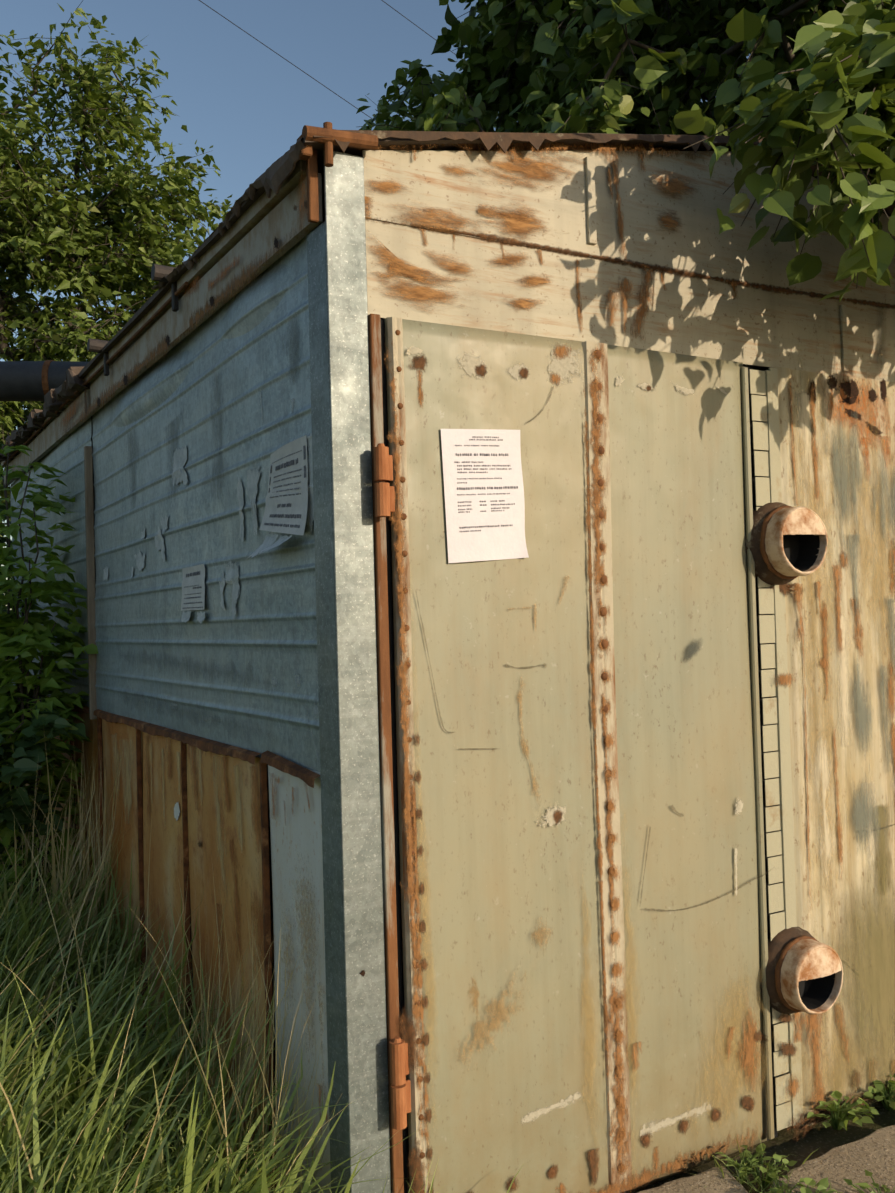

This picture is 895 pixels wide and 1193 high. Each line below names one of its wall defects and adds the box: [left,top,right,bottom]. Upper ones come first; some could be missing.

corrosion [365,142,895,338]
corrosion [64,228,302,433]
corrosion [788,382,798,506]
corrosion [809,379,889,499]
corrosion [817,554,864,696]
corrosion [387,354,434,1193]
corrosion [580,346,758,1193]
corrosion [770,583,810,867]
corrosion [833,729,843,877]
corrosion [727,997,768,1111]
corrosion [779,1004,895,1135]
corrosion [548,1165,566,1193]